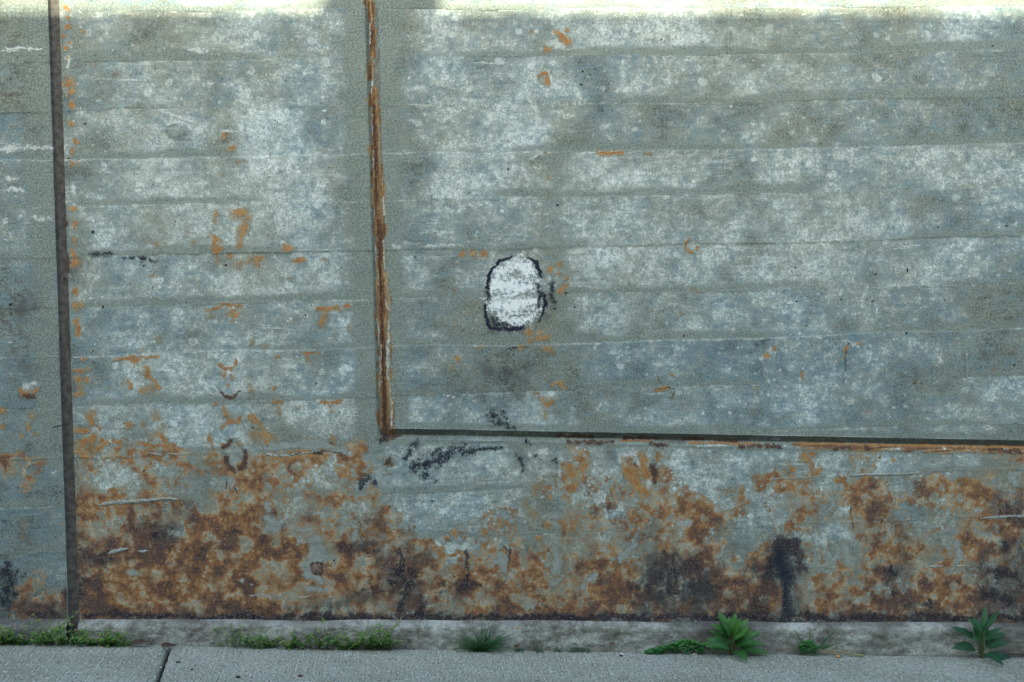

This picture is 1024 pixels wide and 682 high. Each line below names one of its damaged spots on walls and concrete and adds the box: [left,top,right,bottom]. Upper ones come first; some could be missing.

rust [530,20,573,53]
rust [61,5,86,168]
rust [65,184,83,273]
rust [211,207,265,269]
rust [277,237,305,263]
rust [363,0,403,444]
rust [68,287,90,398]
rust [206,302,242,322]
rust [315,303,351,326]
rust [73,358,1024,623]
damp [83,535,1024,623]